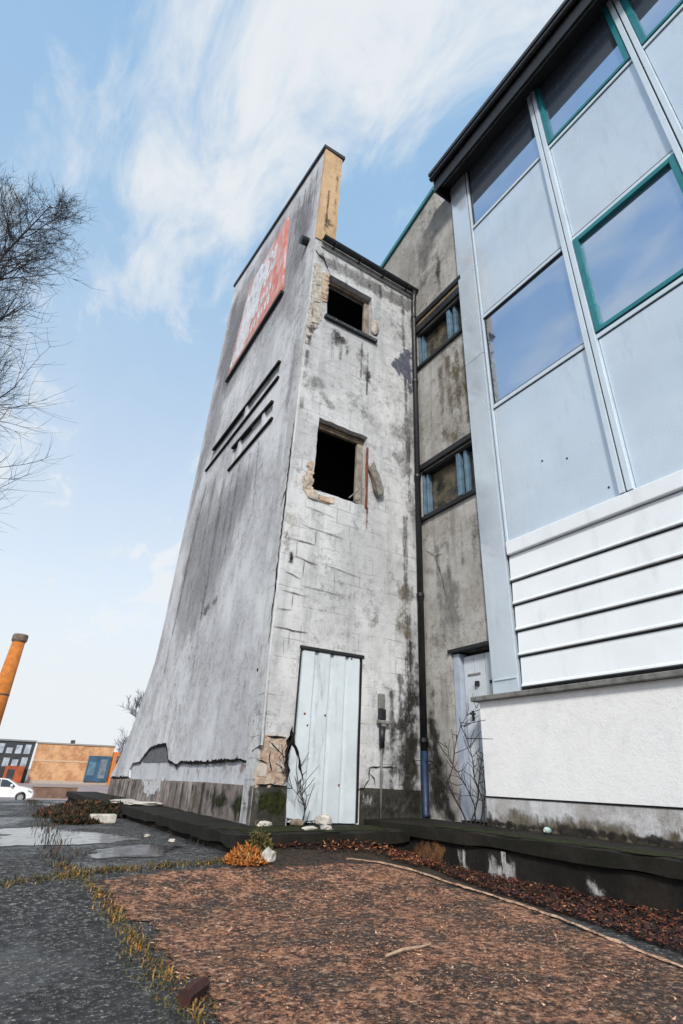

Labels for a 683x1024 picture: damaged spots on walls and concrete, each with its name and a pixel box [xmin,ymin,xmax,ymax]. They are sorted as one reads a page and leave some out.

spalling [305,263,330,344]
leakage [438,346,470,422]
leakage [395,377,413,476]
spalling [302,461,335,504]
leakage [360,505,455,821]
spalling [143,745,169,763]
crack [110,726,293,787]
spalling [253,734,287,788]
leakage [501,809,679,848]